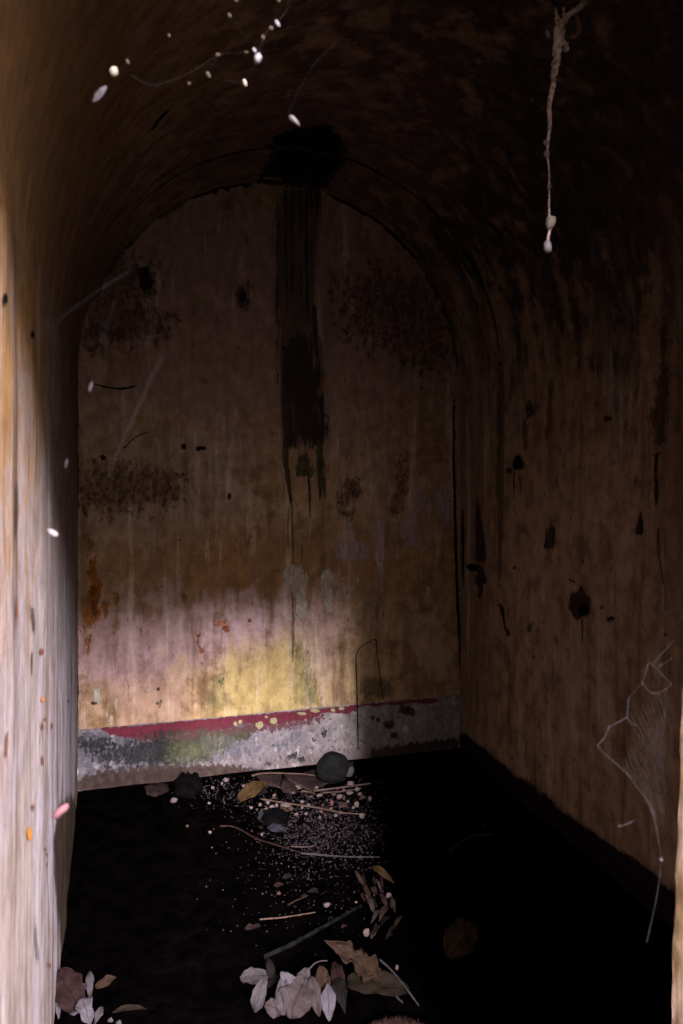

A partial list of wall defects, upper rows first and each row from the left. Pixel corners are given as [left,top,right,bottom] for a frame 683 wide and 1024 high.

water stain [276,188,458,519]
water stain [78,455,197,522]
rust [82,538,120,654]
peeling [282,564,360,622]
peeling [91,686,438,743]